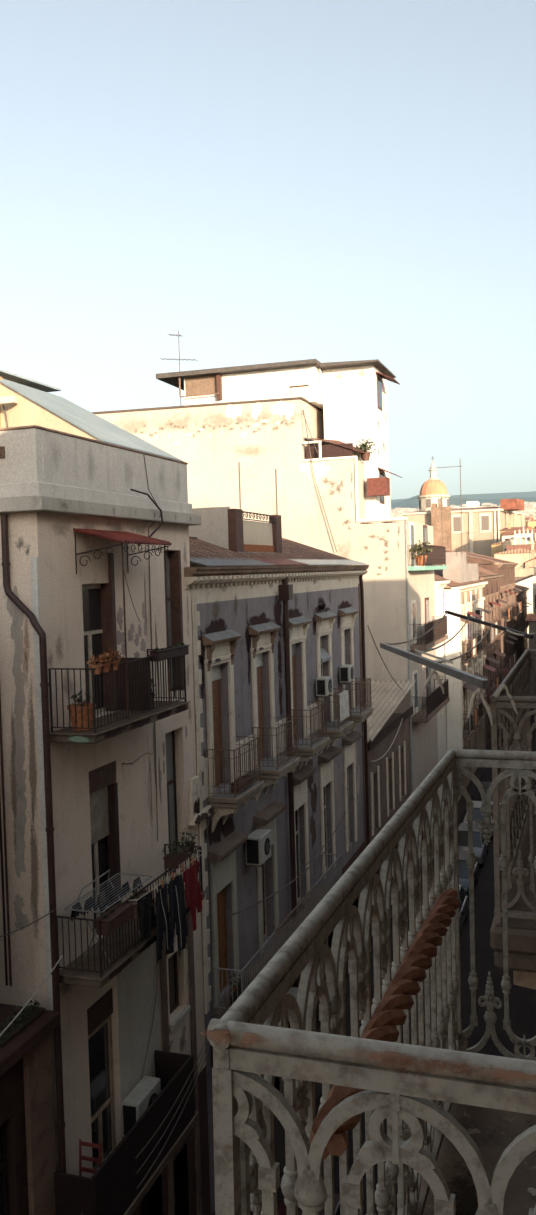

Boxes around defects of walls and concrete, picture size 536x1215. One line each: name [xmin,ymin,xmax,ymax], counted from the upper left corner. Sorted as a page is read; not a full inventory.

spalling [155,401,295,445]
damp [11,695,37,919]